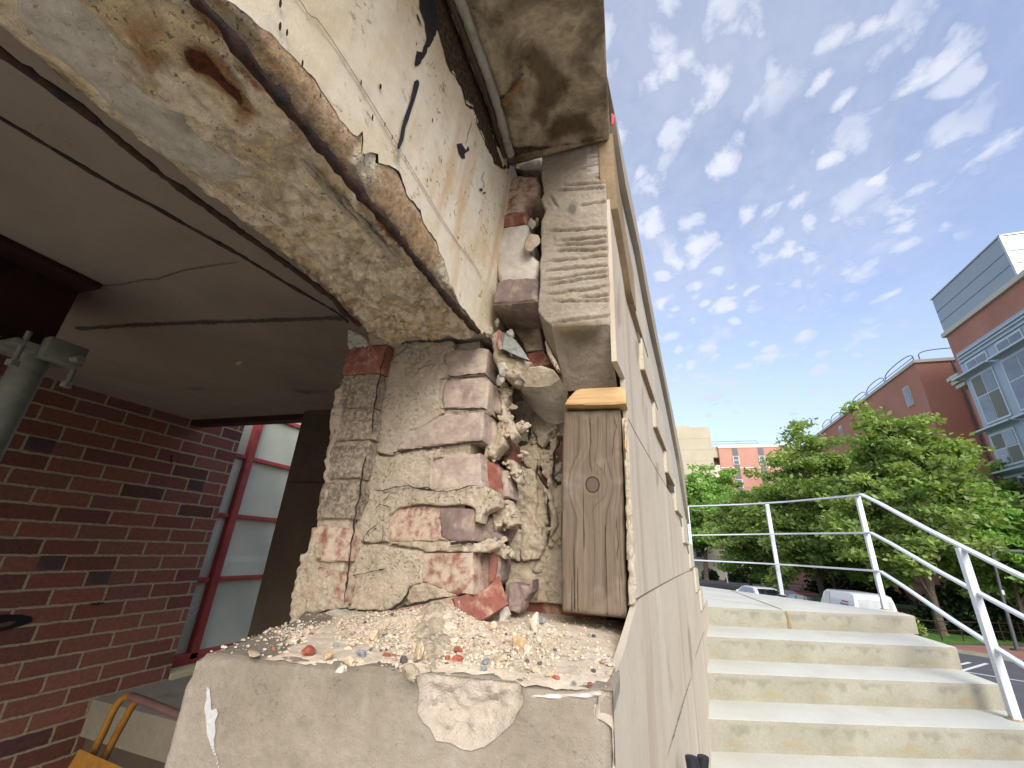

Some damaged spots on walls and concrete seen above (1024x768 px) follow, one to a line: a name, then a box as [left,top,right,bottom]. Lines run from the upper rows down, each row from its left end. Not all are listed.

rust [184,45,260,122]
spalling [0,0,484,344]
crack [102,262,237,286]
crack [344,342,489,605]
damp [204,688,219,767]
spalling [416,673,616,768]